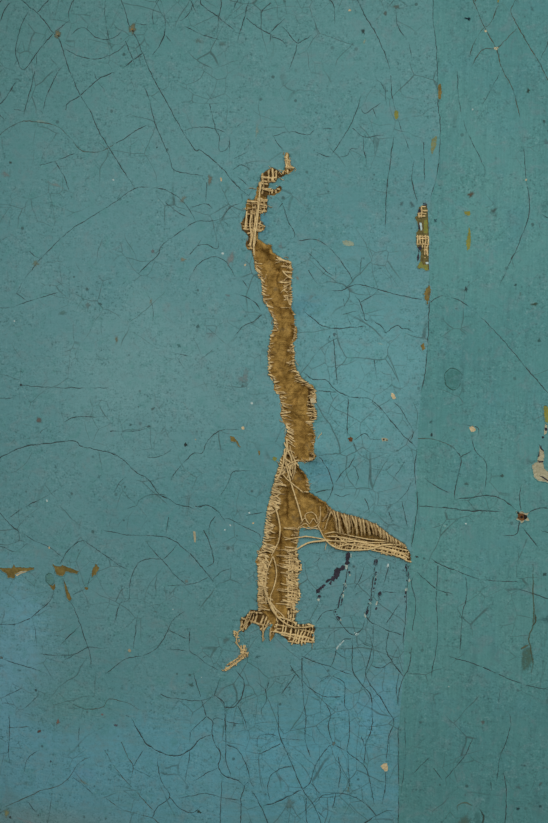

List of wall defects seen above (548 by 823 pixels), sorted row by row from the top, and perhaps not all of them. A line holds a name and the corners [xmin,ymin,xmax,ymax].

crack [272,0,548,229]
peeling [414,203,430,272]
crack [510,155,530,262]
peeling [422,284,432,306]
peeling [531,404,548,484]
crack [0,203,548,823]
peeling [0,563,35,580]
peeling [49,563,80,602]
peeling [316,551,352,622]
peeling [364,556,395,618]